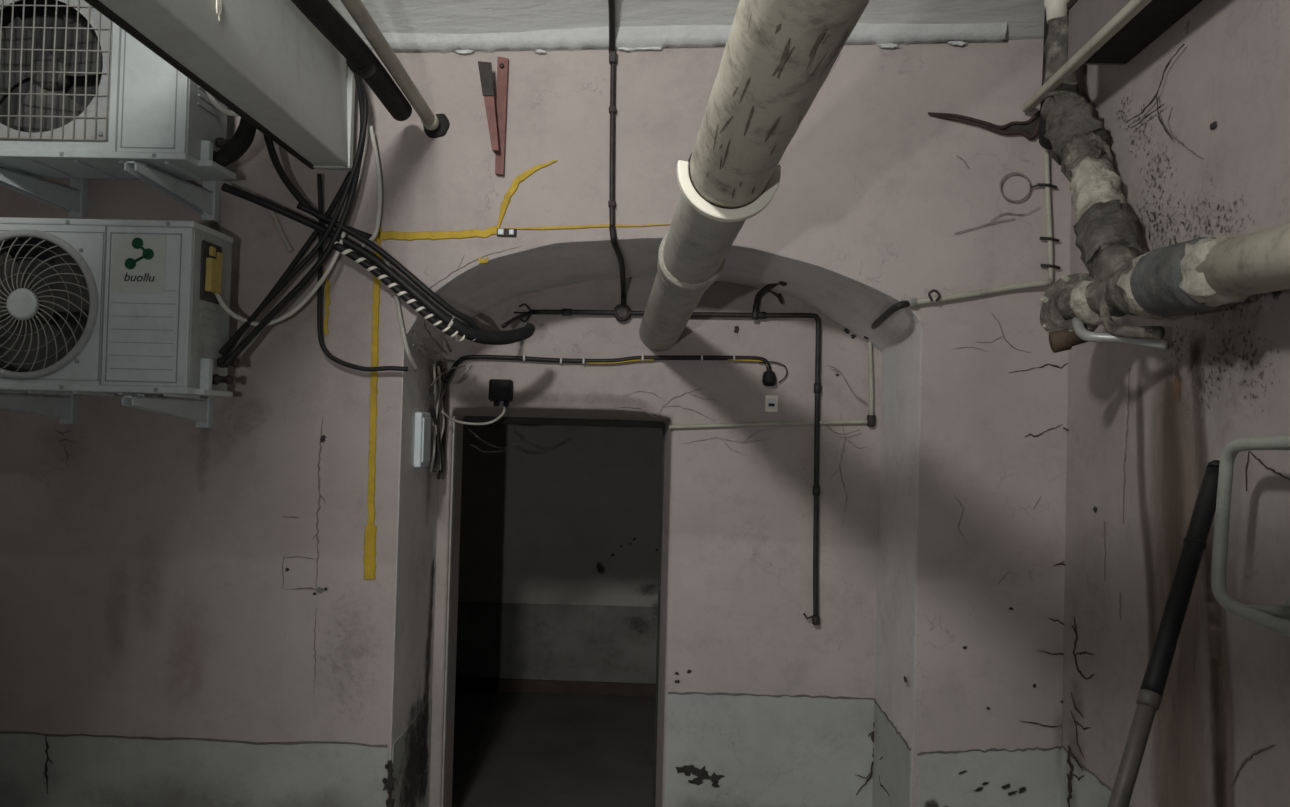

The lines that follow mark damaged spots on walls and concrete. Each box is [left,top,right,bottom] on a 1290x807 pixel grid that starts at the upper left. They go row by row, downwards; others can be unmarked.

crack [1156,107,1203,159]
leakage [1117,91,1255,249]
crack [954,312,1068,373]
crack [282,418,325,695]
crack [45,734,53,793]
crack [1021,617,1094,807]